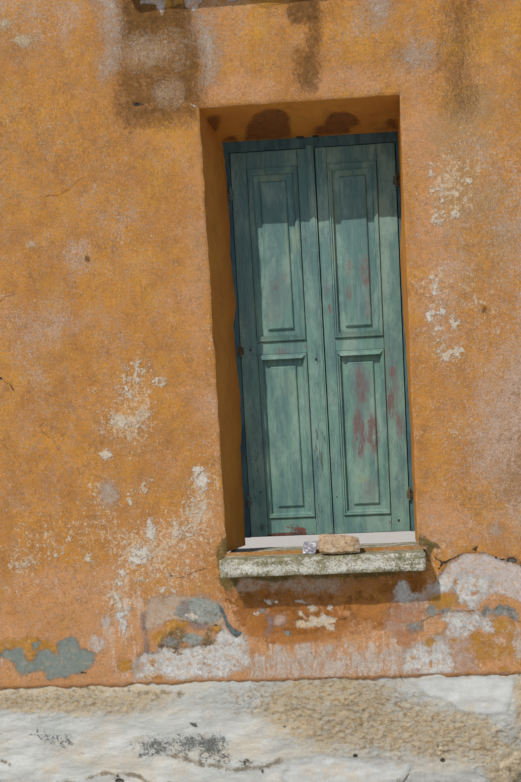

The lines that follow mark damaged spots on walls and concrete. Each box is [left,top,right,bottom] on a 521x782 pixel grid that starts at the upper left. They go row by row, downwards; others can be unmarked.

water stain [88,0,225,135]
water stain [284,0,325,97]
water stain [386,0,486,123]
peeling [107,357,152,434]
flaking render [0,637,59,662]
peeling [87,517,158,653]
flaking render [115,562,251,682]
flaking render [263,599,351,645]
flaking render [382,546,521,674]
crack [435,552,487,570]
water stain [134,730,252,766]